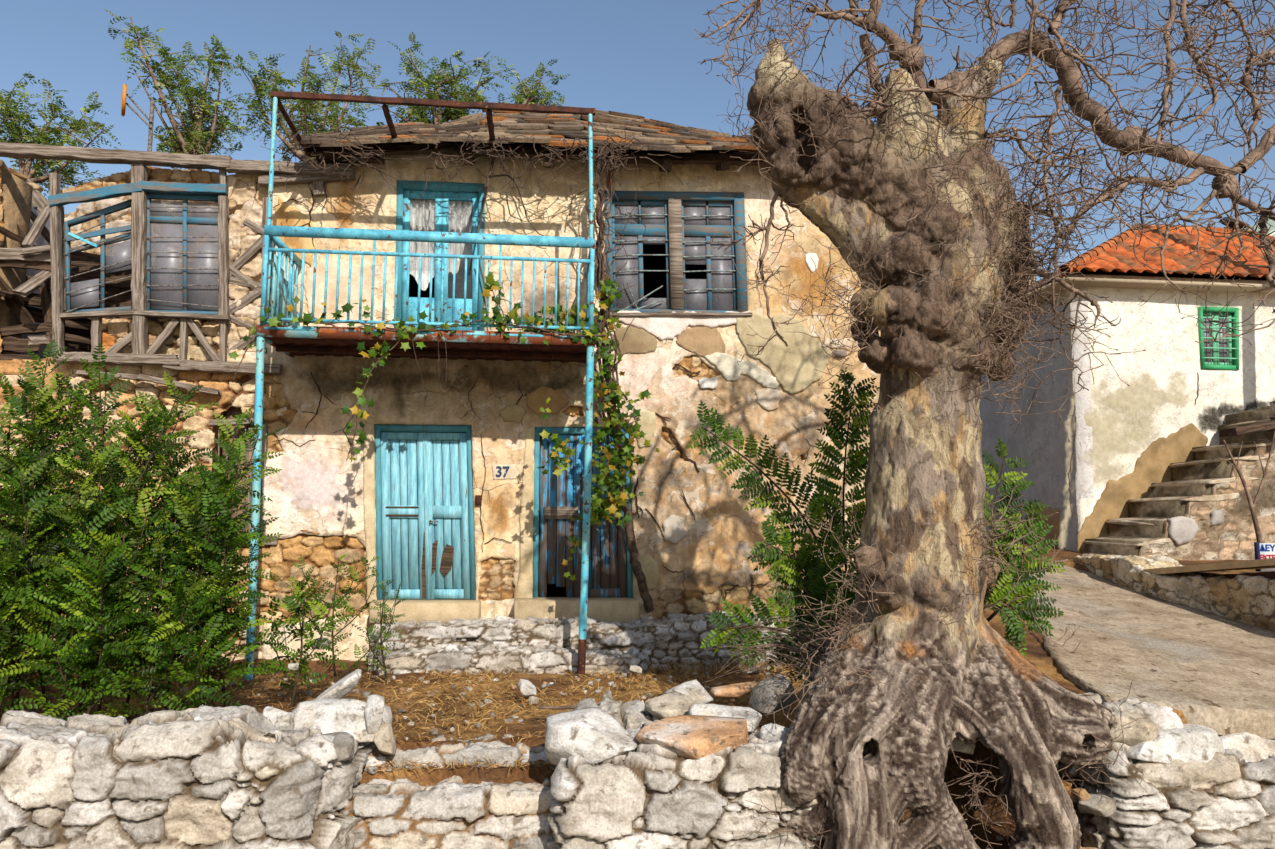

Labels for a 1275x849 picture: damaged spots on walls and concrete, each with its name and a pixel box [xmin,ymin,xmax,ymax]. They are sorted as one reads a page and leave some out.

spalling [0,159,44,247]
rust [315,326,364,337]
rust [433,330,467,338]
flaking render [672,355,721,383]
crack [634,477,684,573]
crack [655,412,700,520]
water stain [1060,471,1070,548]
water stain [1067,374,1185,482]
flaking render [256,530,377,624]
flaking render [478,557,516,601]